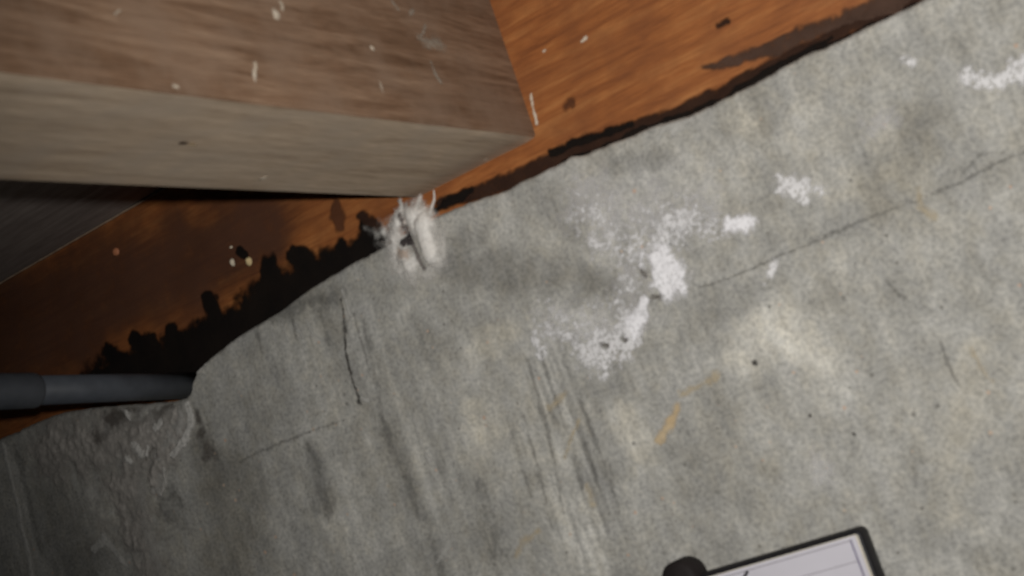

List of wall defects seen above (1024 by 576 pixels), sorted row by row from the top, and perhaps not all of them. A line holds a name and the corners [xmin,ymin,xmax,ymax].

damp [960,54,1024,89]
damp [531,189,756,381]
damp [764,259,778,285]
crack [340,289,370,404]